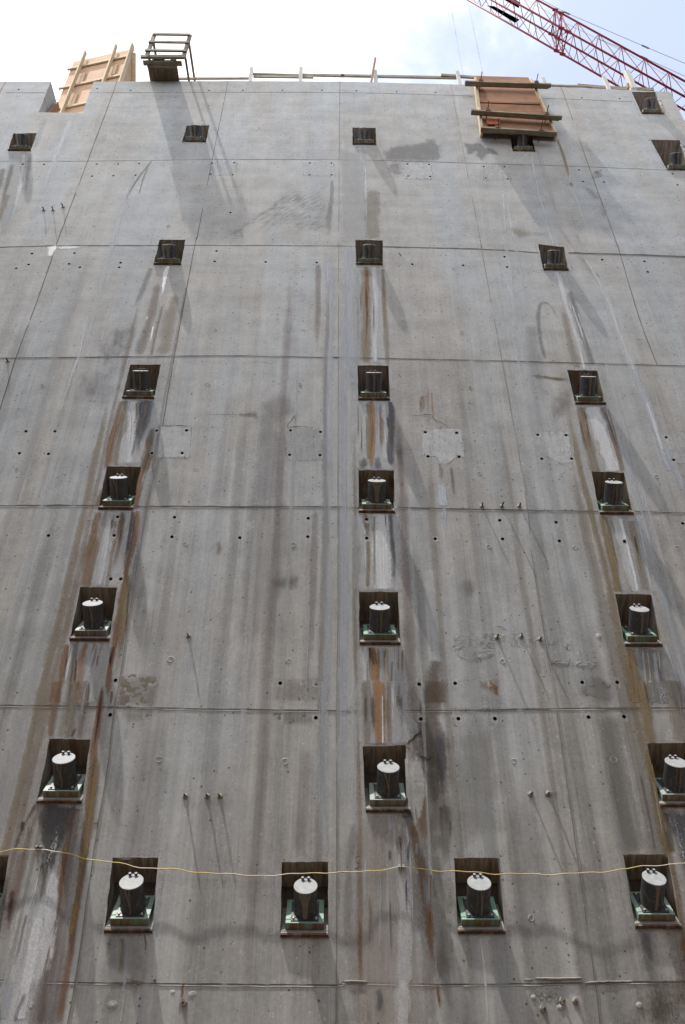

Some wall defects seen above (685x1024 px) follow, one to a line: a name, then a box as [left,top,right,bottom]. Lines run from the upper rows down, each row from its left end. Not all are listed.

rust [356,262,385,362]
rust [358,398,394,469]
rust [20,396,155,1024]
spalling [117,674,159,718]
rust [360,641,405,743]